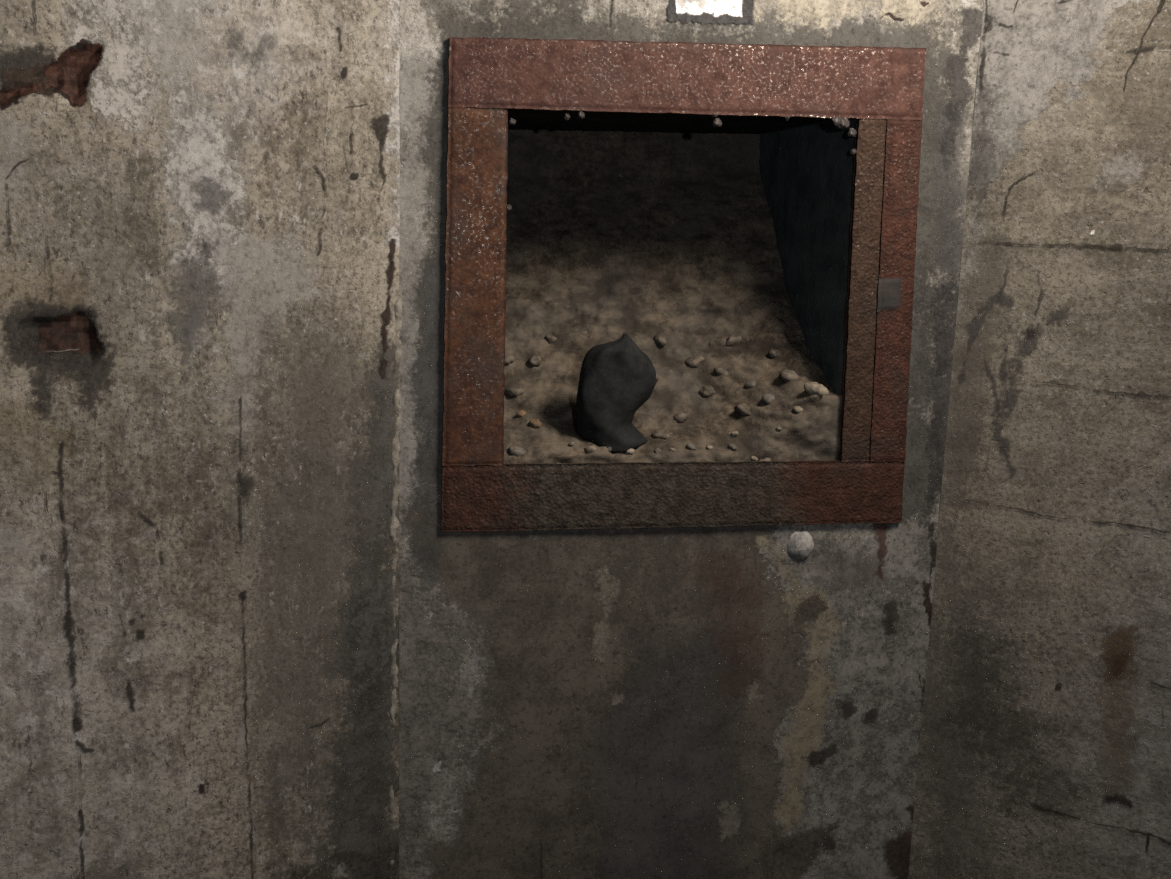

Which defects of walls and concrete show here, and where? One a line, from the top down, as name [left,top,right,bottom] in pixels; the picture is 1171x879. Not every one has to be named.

crack [1124,0,1166,91]
crack [978,242,1170,252]
water stain [287,0,1014,879]
water stain [984,278,1070,477]